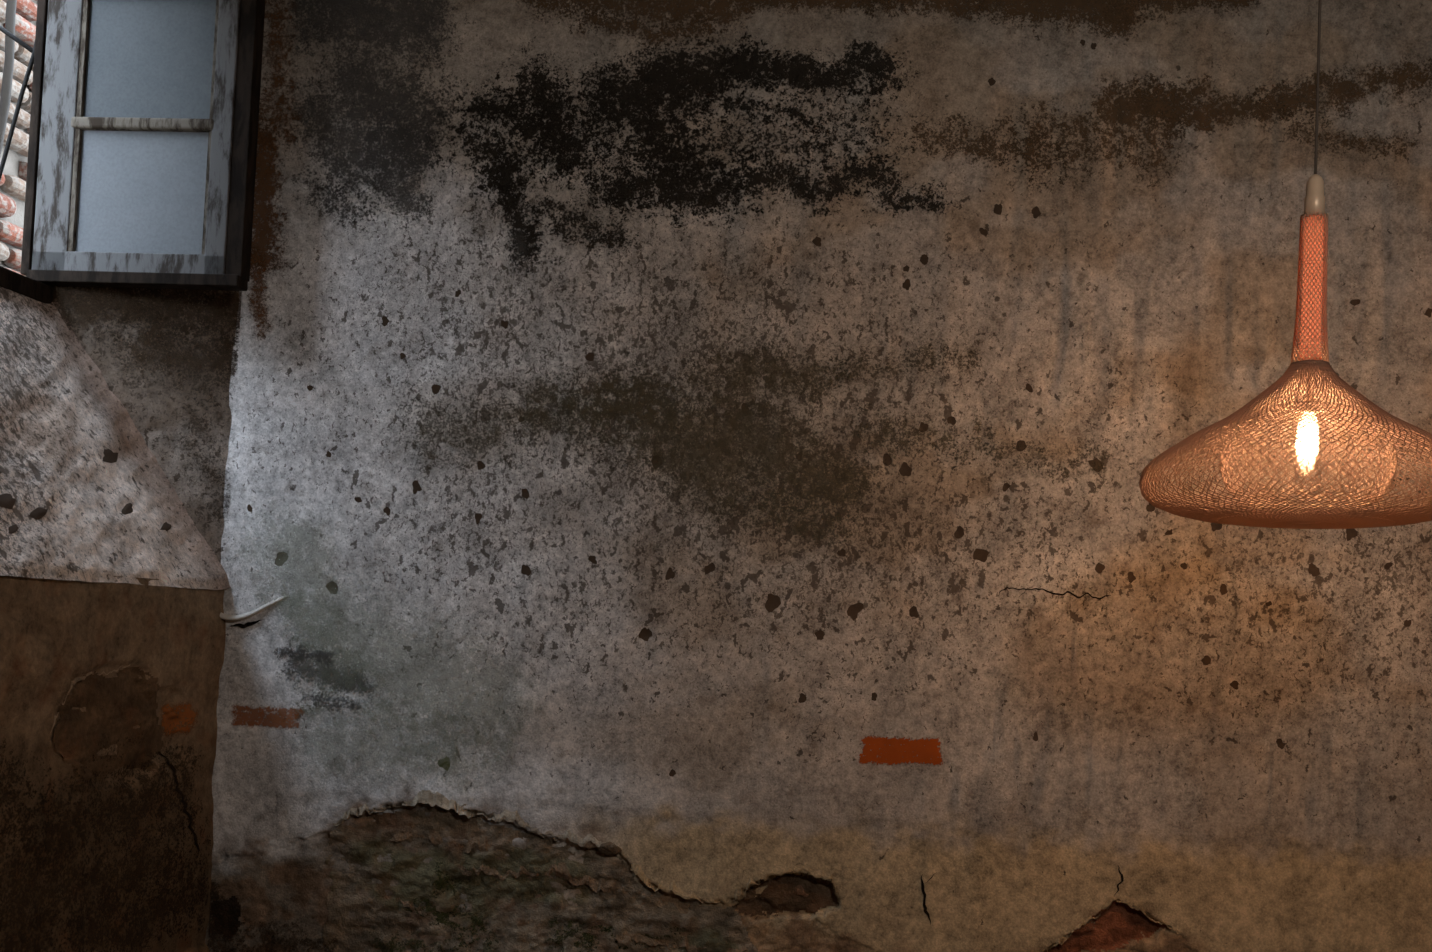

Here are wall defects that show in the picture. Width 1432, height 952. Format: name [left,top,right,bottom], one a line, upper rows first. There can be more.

leakage [282,0,1432,293]
leakage [396,339,1138,547]
leakage [0,734,338,952]
flaking render [438,757,450,771]
flaking render [323,790,840,952]
flaking render [1037,866,1179,952]